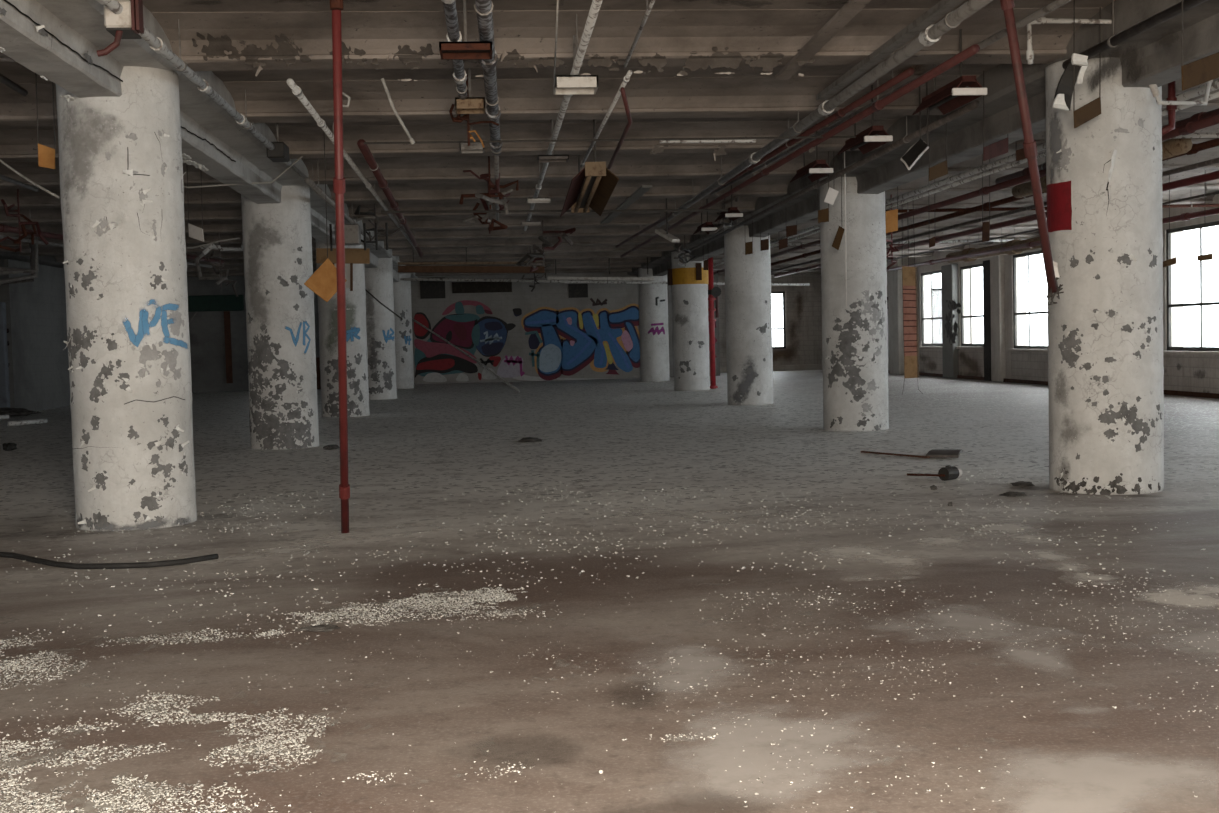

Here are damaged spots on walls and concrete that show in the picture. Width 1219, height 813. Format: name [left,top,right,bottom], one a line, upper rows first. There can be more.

peeling [192,32,311,77]
peeling [327,41,483,81]
peeling [63,258,104,300]
peeling [150,261,168,290]
peeling [64,304,184,492]
peeling [247,310,412,450]
peeling [826,290,887,431]
peeling [1058,309,1162,452]
peeling [127,415,189,525]
spalling [1054,453,1161,495]
damp [659,649,724,690]
damp [694,716,854,796]